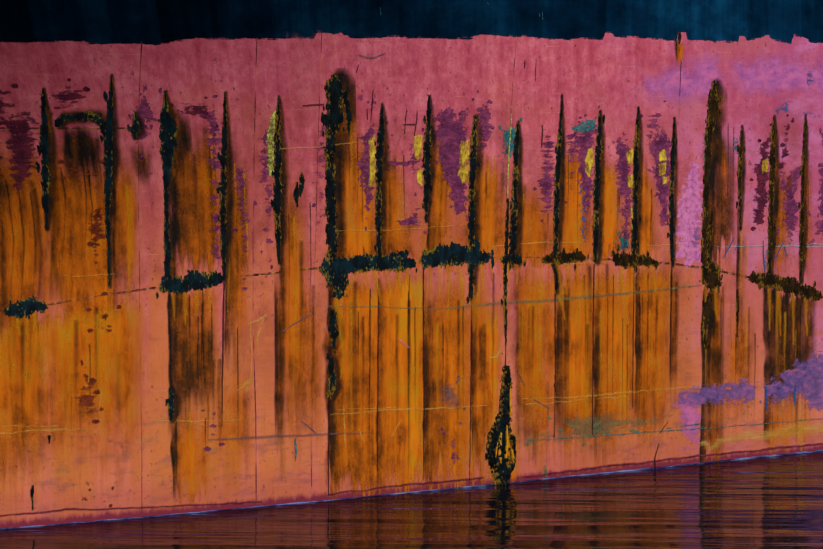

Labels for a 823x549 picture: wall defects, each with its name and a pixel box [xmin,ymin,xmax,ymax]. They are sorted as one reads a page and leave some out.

rust [0,74,149,446]
rust [156,90,248,500]
rust [271,70,678,499]
rust [700,80,822,463]